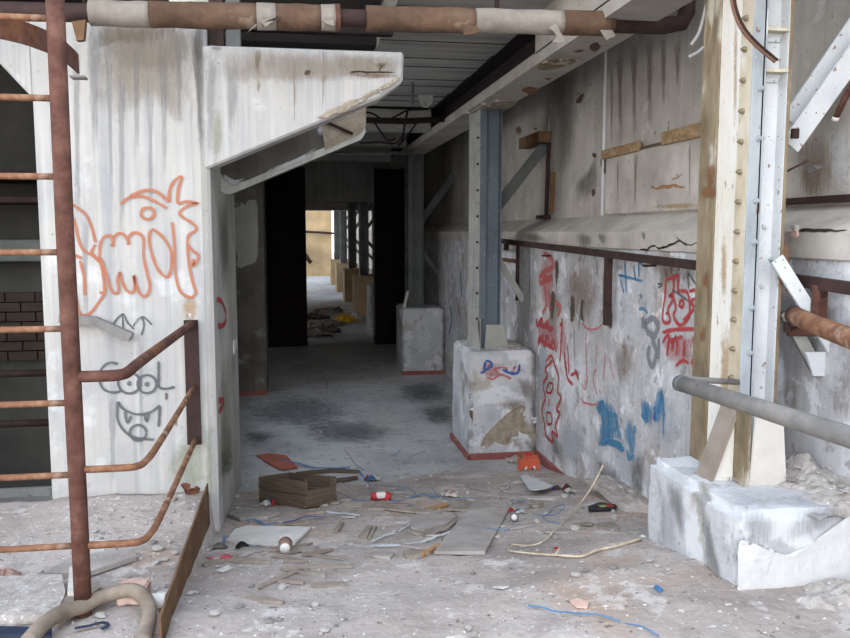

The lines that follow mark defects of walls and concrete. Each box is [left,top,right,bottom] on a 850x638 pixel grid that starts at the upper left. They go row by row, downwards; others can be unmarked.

spalling [318,77,400,132]
peeling [276,151,312,170]
corrosion [702,166,714,197]
crack [640,237,697,251]
crack [799,226,847,234]
peeling [479,405,537,453]
peeling [737,517,850,590]